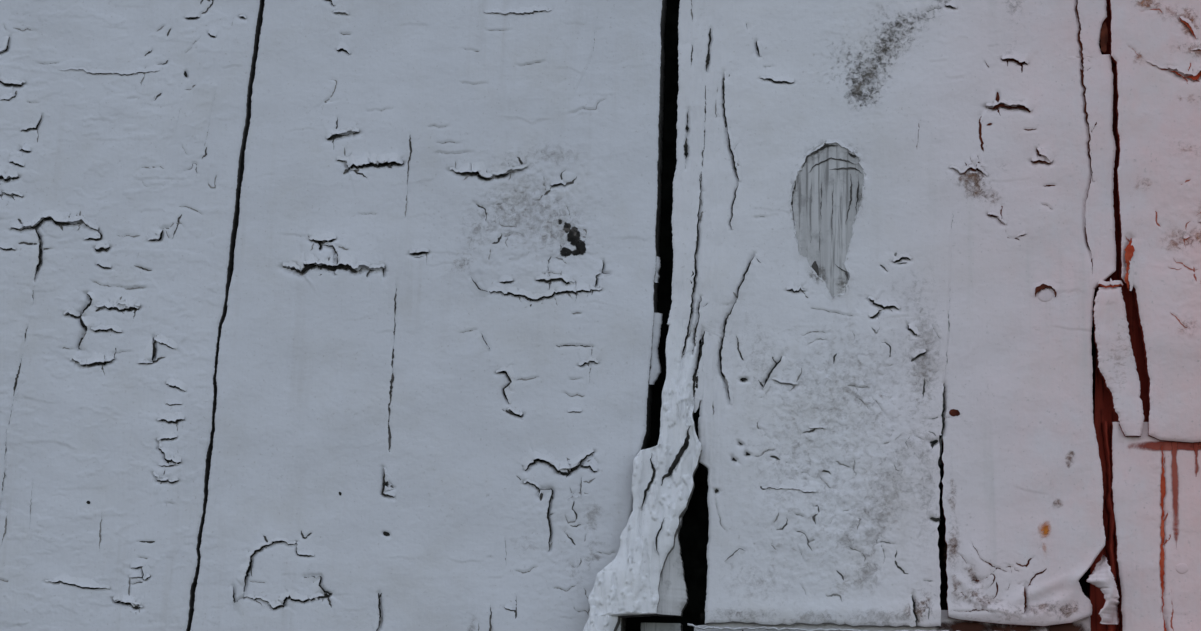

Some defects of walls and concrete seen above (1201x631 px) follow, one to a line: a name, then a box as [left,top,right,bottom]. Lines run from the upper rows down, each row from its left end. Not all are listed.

crack [9,114,42,167]
crack [95,126,216,288]
crack [405,125,460,215]
crack [467,171,610,314]
peeling [787,139,869,302]
crack [986,50,1029,71]
peeling [1146,60,1201,82]
crack [0,292,34,541]
crack [388,288,397,452]
crack [460,330,536,417]
crack [686,252,1046,627]
crack [478,478,614,631]